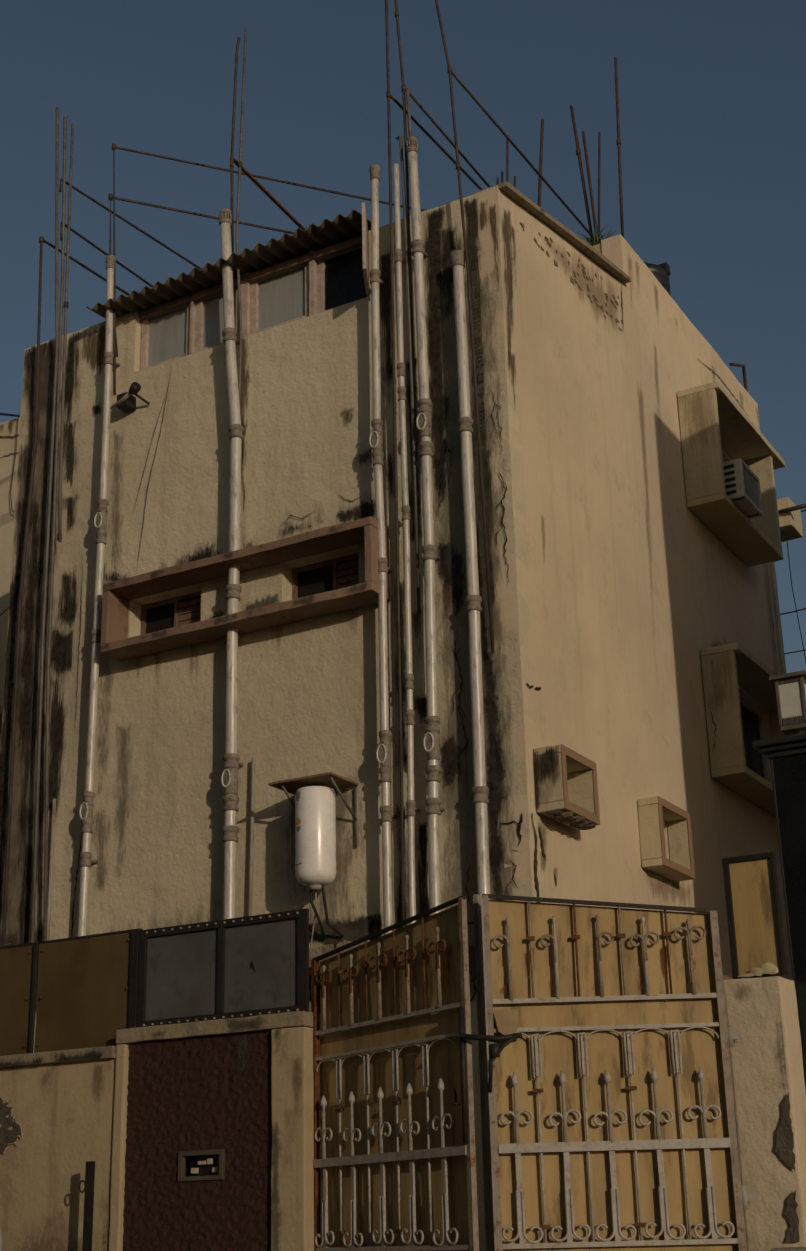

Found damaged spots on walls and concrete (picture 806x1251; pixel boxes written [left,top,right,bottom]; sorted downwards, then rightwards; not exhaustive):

peeling [520,222,623,331]
water stain [237,337,249,509]
mould [181,543,262,563]
mould [330,500,376,531]
water stain [381,199,516,947]
water stain [0,324,106,1011]
crack [451,624,469,797]
water stain [305,789,382,948]
crack [498,813,557,903]
peeling [0,1097,23,1154]
spalling [775,1093,795,1170]
spalling [785,1190,799,1243]